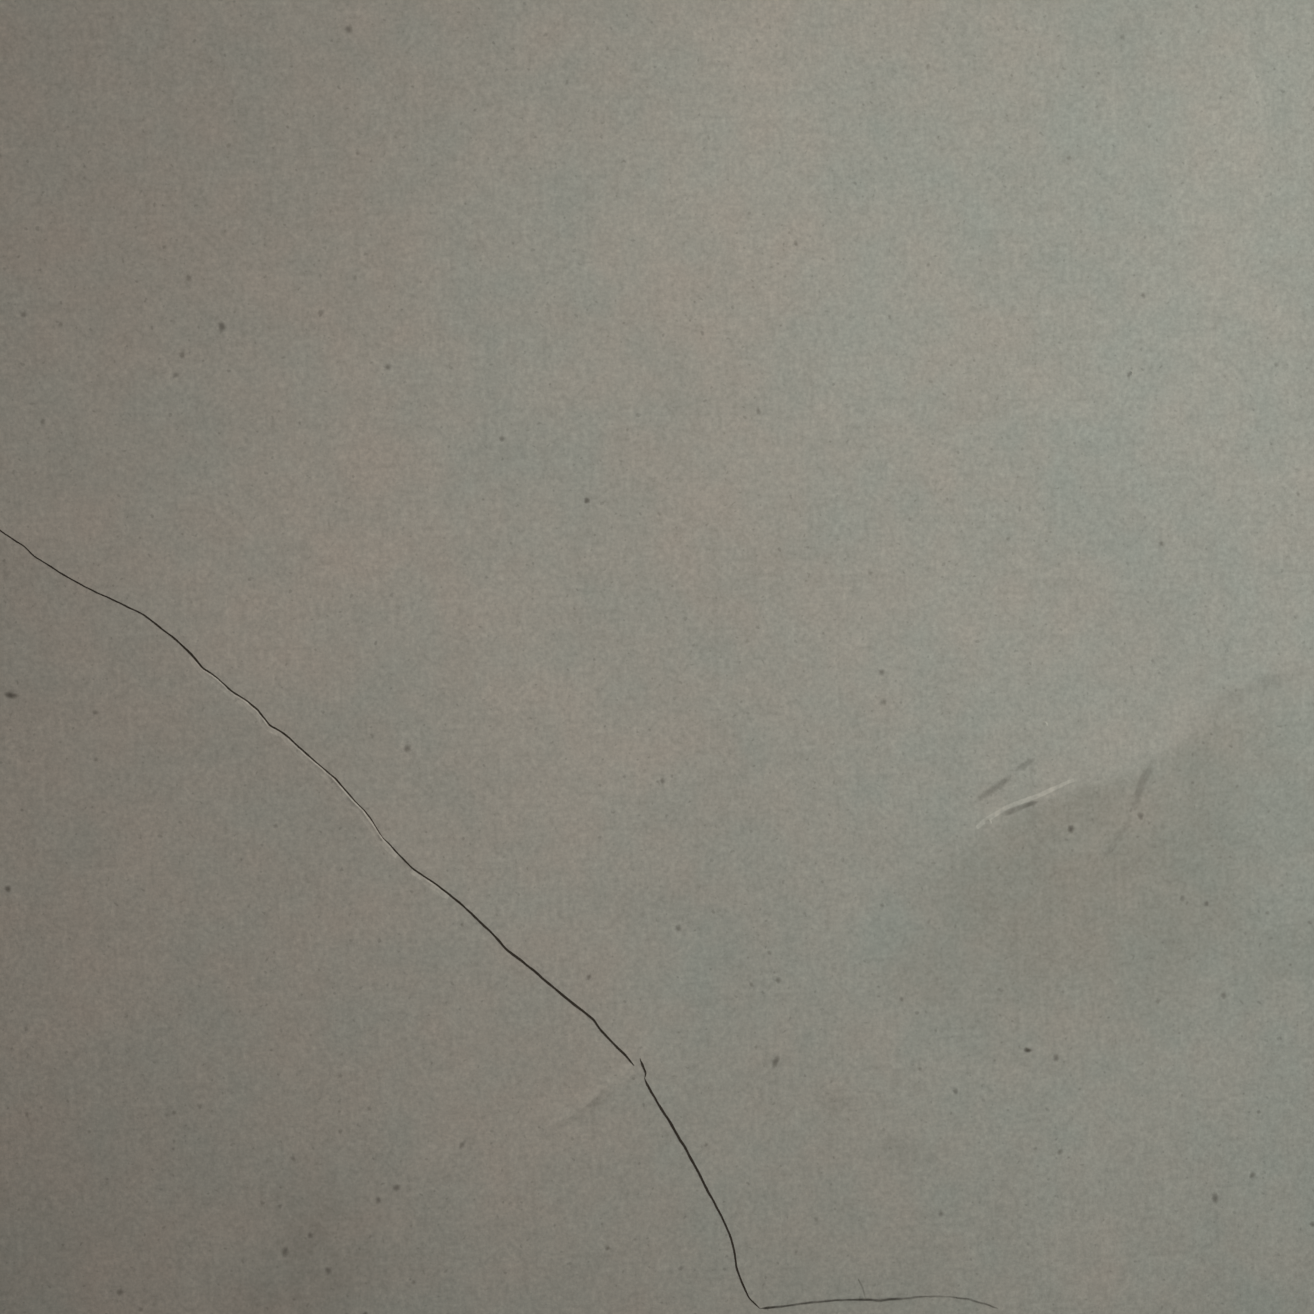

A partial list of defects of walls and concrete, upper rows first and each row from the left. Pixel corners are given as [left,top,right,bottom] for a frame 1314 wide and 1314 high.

crack [0,530,897,1309]